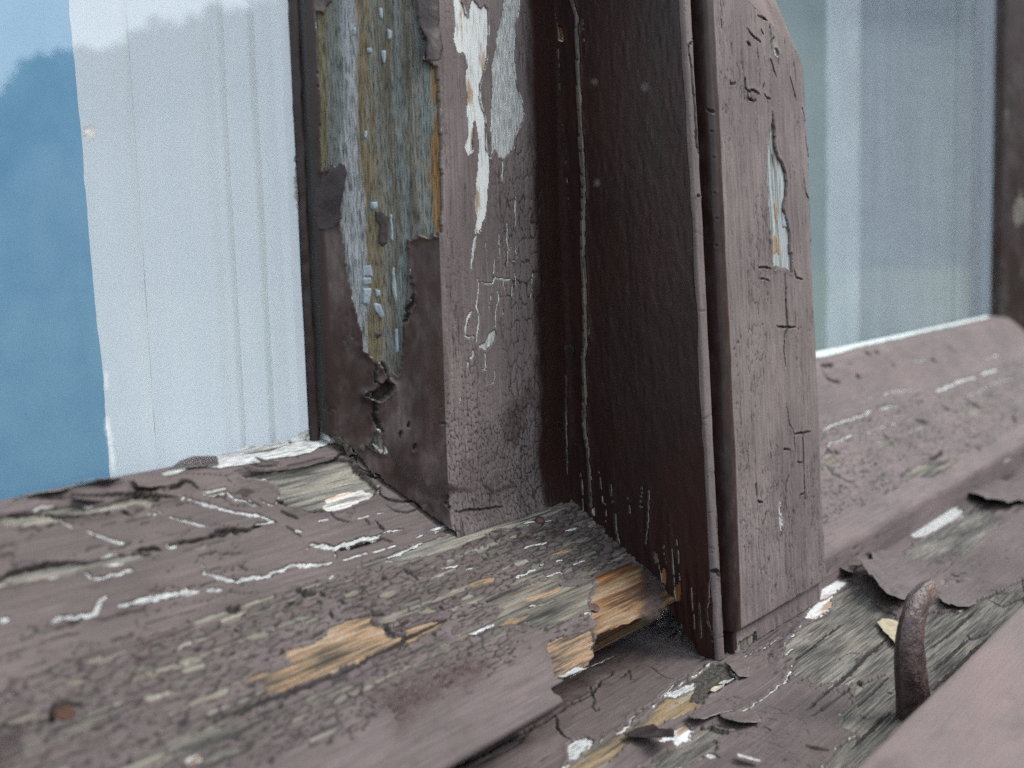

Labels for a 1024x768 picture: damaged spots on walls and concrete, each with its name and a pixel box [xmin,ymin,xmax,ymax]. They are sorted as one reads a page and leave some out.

peeling [316,0,524,400]
peeling [766,125,790,270]
crack [464,161,533,386]
crack [0,461,422,623]
peeling [243,456,381,512]
peeling [246,616,443,693]
crack [469,624,494,635]
peeling [547,631,595,678]
peeling [568,635,761,768]
peeling [654,551,682,601]
peeling [784,479,1024,768]